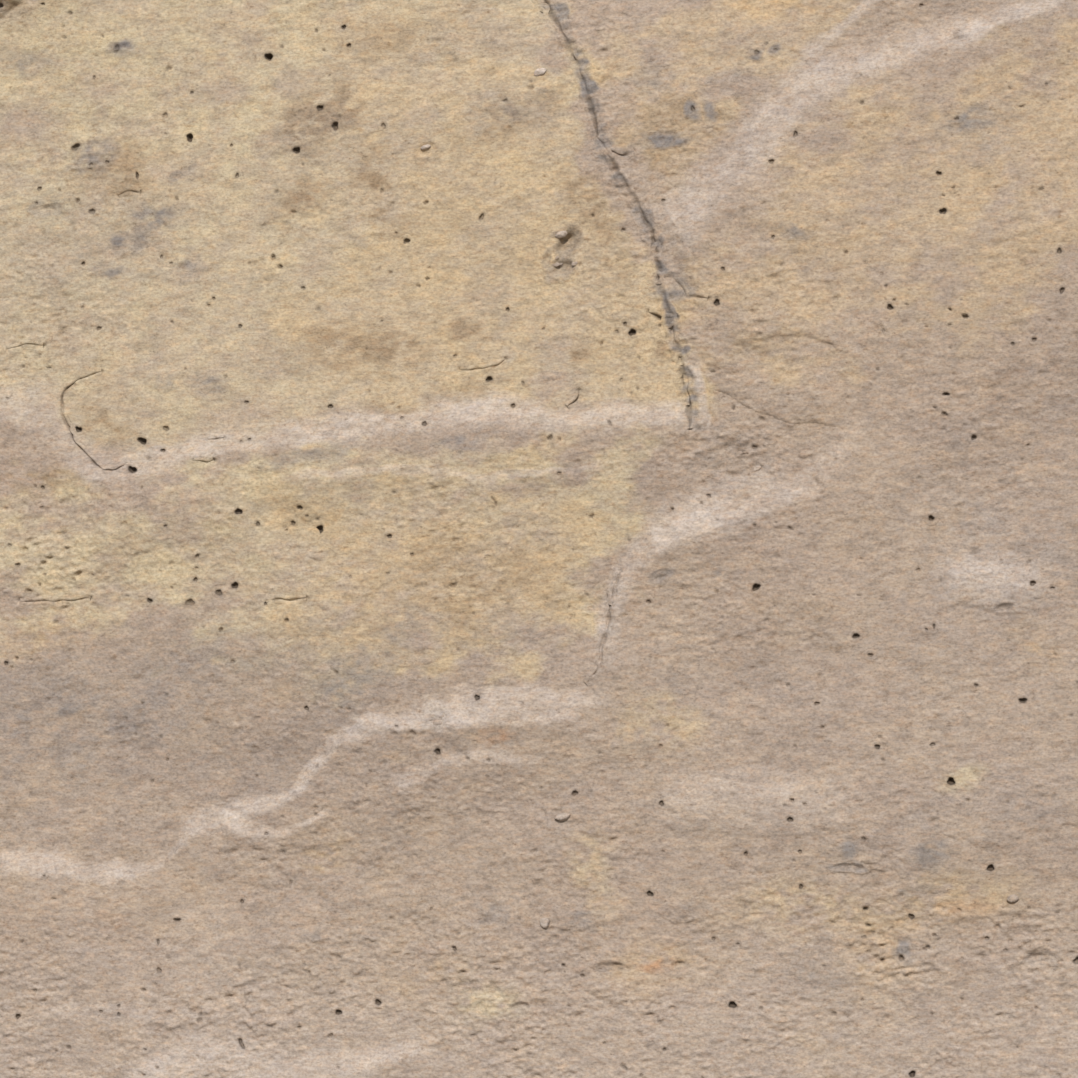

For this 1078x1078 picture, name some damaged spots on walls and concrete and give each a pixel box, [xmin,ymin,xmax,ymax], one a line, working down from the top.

crack [57,368,127,474]
crack [535,0,708,437]